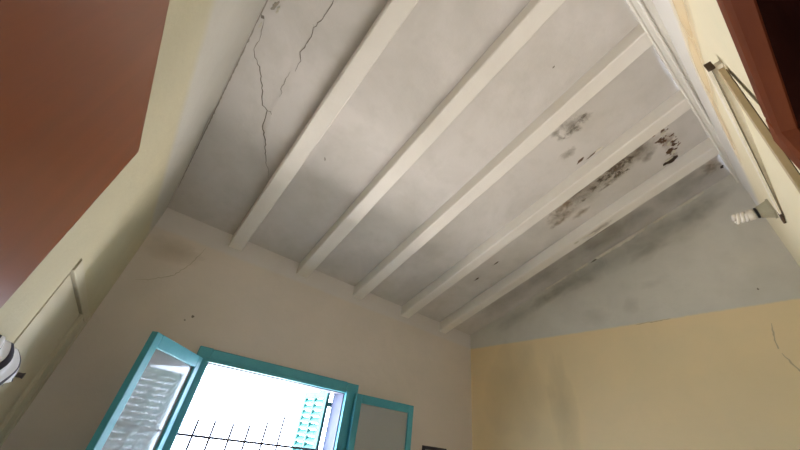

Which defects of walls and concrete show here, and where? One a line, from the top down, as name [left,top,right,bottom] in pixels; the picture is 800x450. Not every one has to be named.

crack [178,0,334,187]